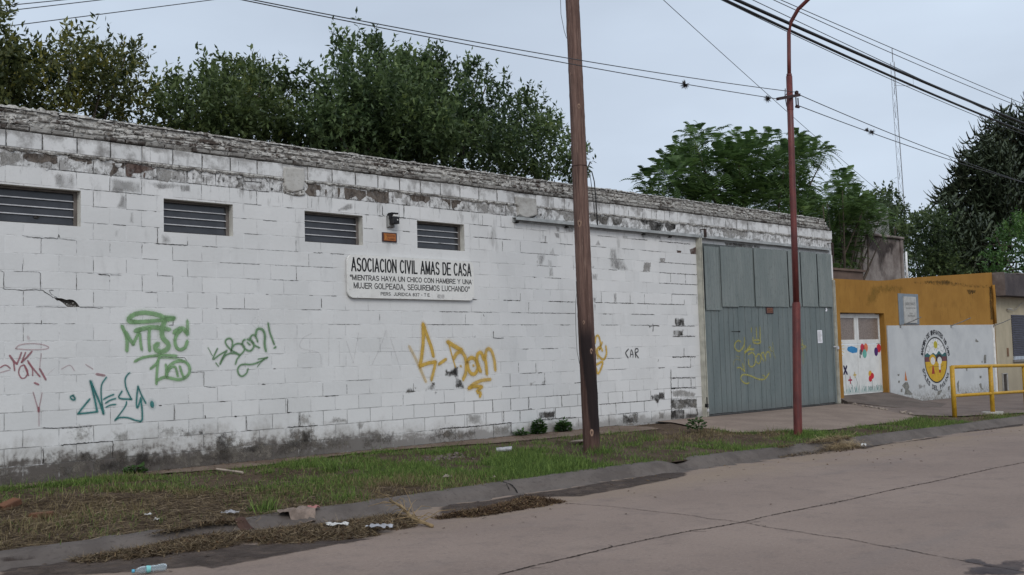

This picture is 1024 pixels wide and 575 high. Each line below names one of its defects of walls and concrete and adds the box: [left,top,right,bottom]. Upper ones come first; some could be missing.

peeling [0,152,92,170]
peeling [110,163,155,178]
peeling [271,181,462,208]
peeling [641,220,676,231]
crack [2,263,97,308]
damp [5,417,349,483]